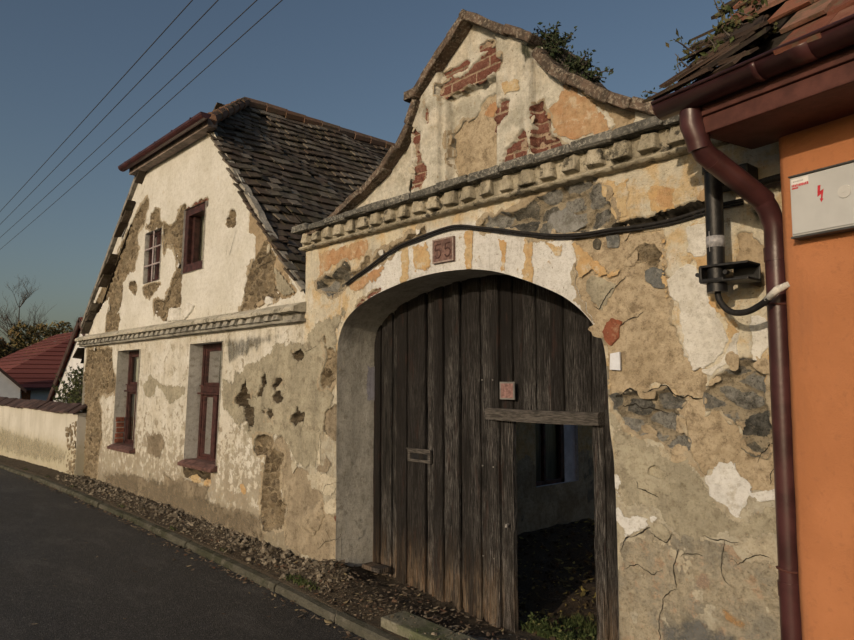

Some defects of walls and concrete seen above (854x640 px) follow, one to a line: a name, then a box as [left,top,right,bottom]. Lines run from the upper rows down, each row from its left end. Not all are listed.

spalling [432,39,503,102]
spalling [408,128,427,192]
spalling [440,79,636,177]
spalling [94,195,209,332]
spalling [238,213,297,312]
spalling [314,223,431,308]
peeling [47,307,345,561]
peeling [366,365,375,401]
peeling [464,178,781,640]
crack [621,527,770,639]